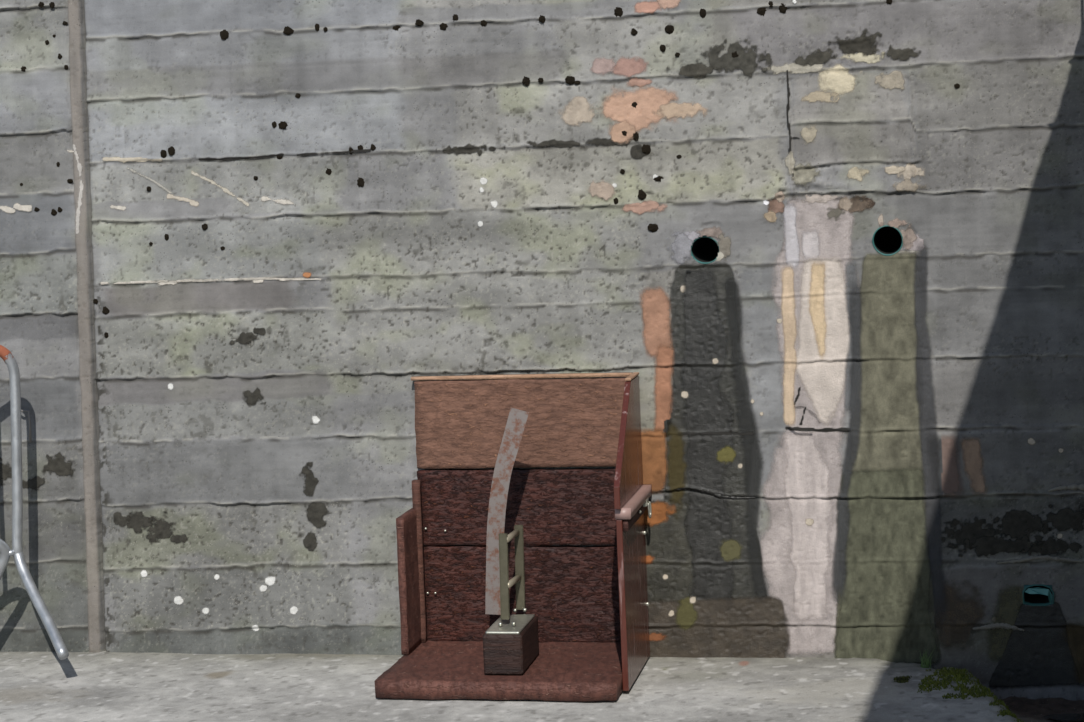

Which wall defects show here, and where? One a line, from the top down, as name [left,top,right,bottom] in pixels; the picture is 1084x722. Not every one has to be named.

crack [786,70,798,180]
peeling [767,52,905,102]
corrosion [641,288,675,526]
water stain [645,196,1084,665]
water stain [989,587,1084,688]